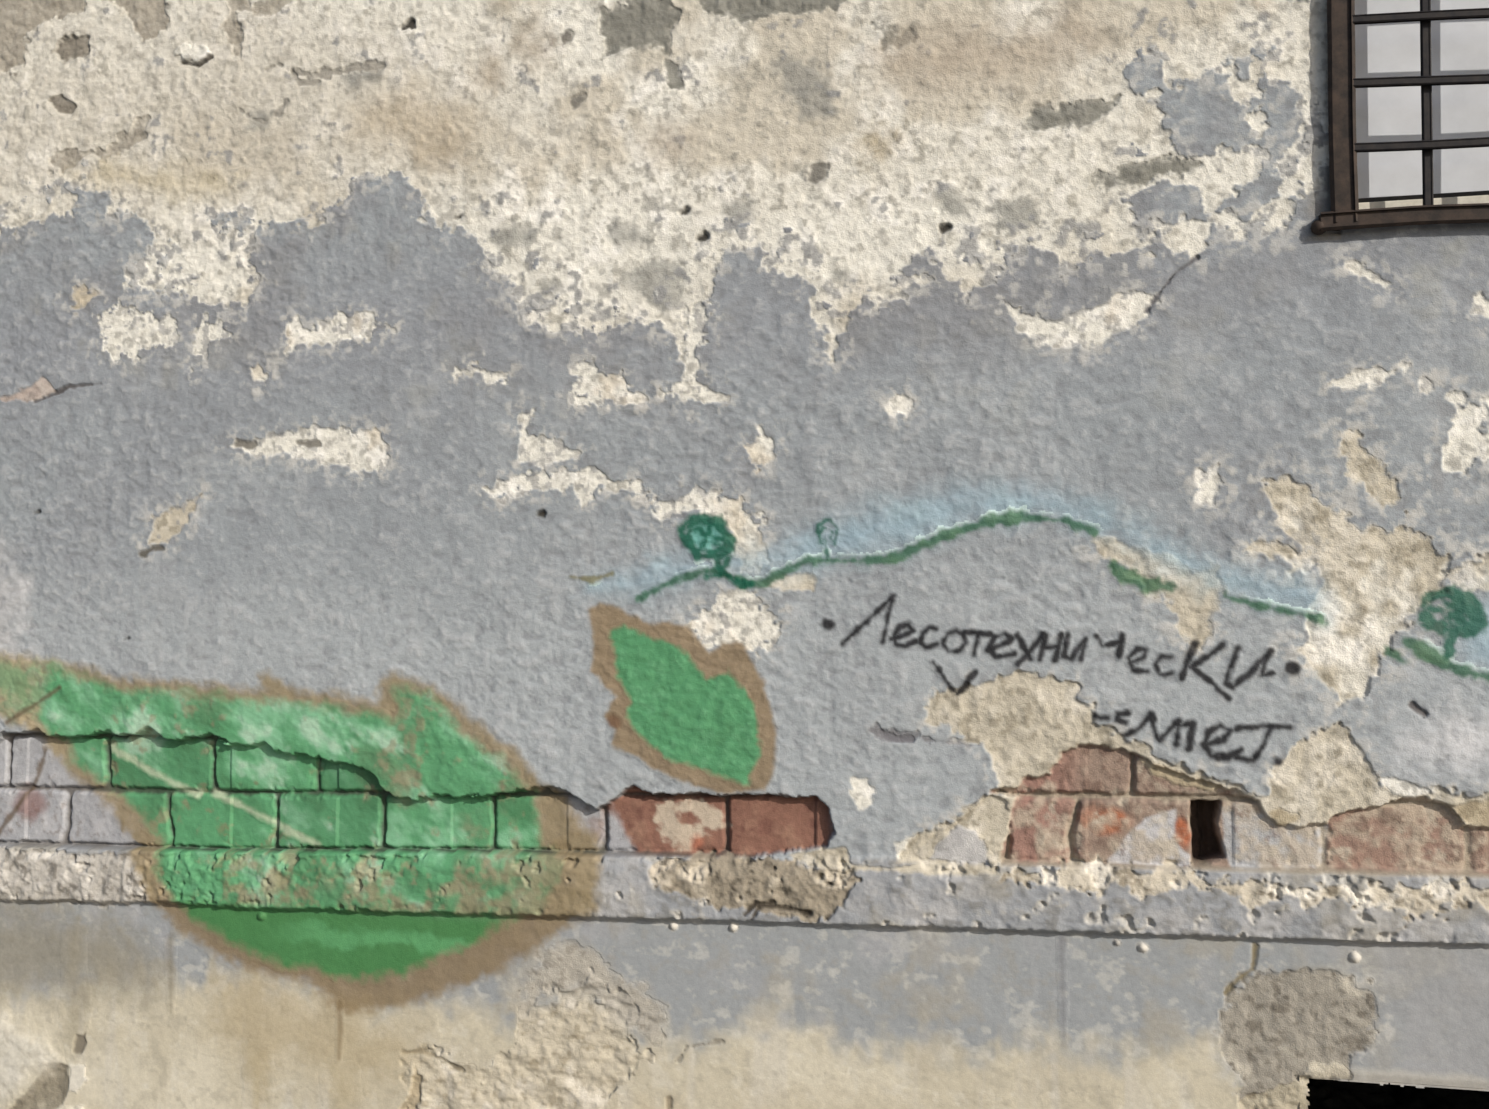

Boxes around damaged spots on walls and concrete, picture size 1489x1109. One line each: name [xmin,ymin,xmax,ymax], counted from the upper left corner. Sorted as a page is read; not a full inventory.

peeling [0,0,1329,408]
peeling [1470,292,1489,318]
peeling [231,424,390,473]
peeling [1194,464,1223,506]
peeling [1328,362,1489,476]
spalling [894,474,1489,879]
spalling [0,732,136,851]
spalling [565,786,835,859]
peeling [849,776,875,811]
spalling [399,940,668,1109]
spalling [1218,942,1379,1109]
spalling [16,1064,86,1109]